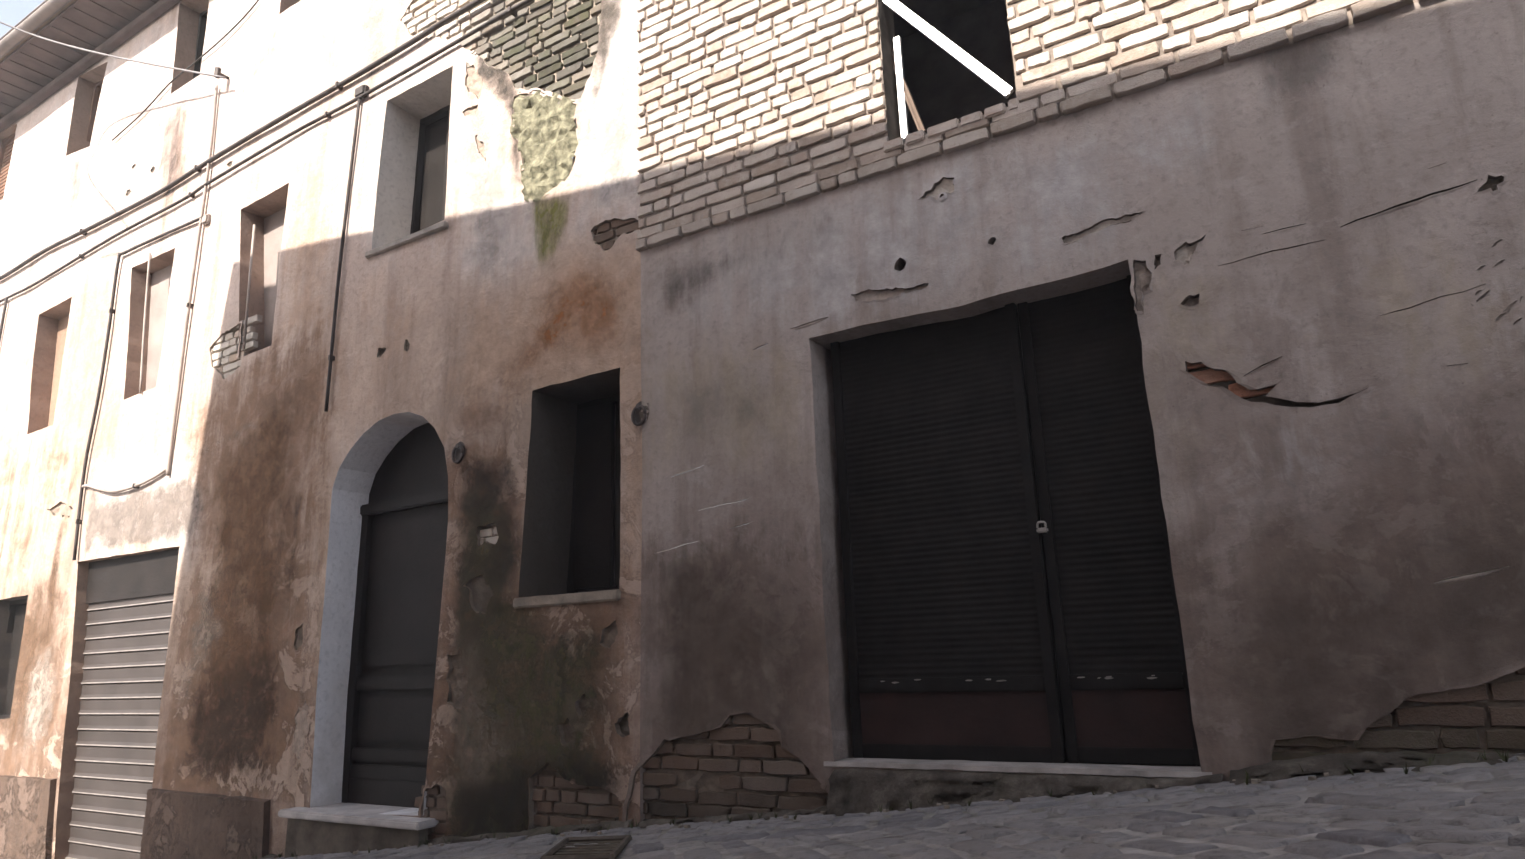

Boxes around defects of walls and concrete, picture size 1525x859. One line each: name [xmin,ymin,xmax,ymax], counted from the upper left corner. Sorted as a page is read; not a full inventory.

damp [478,57,514,115]
spalling [399,0,604,203]
damp [535,198,565,258]
crack [1262,180,1476,235]
spalling [1130,232,1209,315]
spalling [208,314,263,381]
crack [1244,356,1282,377]
damp [192,414,298,774]
damp [457,462,518,669]
spalling [1263,659,1525,764]
damp [456,764,609,837]
spalling [527,707,830,830]